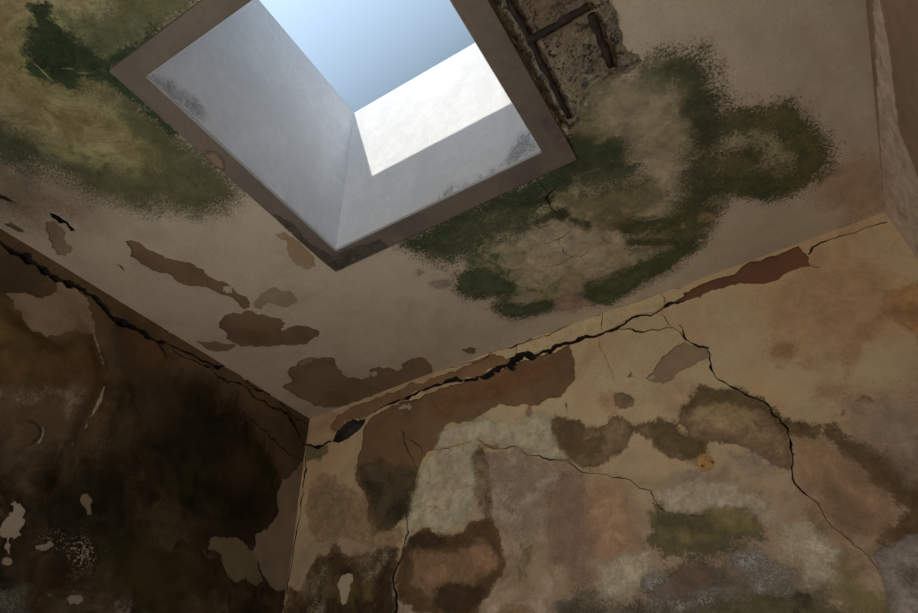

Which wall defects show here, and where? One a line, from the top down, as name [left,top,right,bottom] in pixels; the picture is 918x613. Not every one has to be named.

water stain [0,0,236,219]
peeling [125,240,320,352]
water stain [274,215,387,269]
spalling [490,0,642,131]
water stain [399,46,837,323]
peeling [675,246,810,304]
crack [808,222,887,268]
crack [0,241,332,613]
peeling [282,345,575,532]
water stain [0,298,918,613]
crack [365,283,880,575]
crack [392,507,409,613]